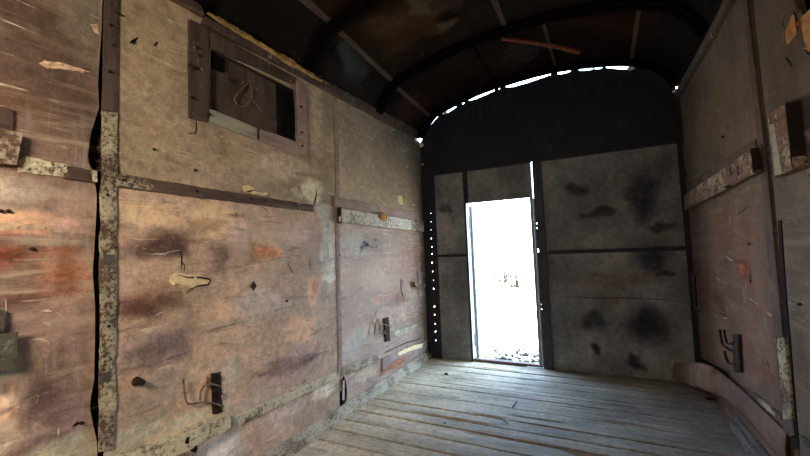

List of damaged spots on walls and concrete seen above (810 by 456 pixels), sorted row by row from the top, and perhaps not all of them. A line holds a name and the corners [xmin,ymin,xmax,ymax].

peeling [785,9,810,52]
peeling [39,60,89,73]
peeling [136,245,250,293]